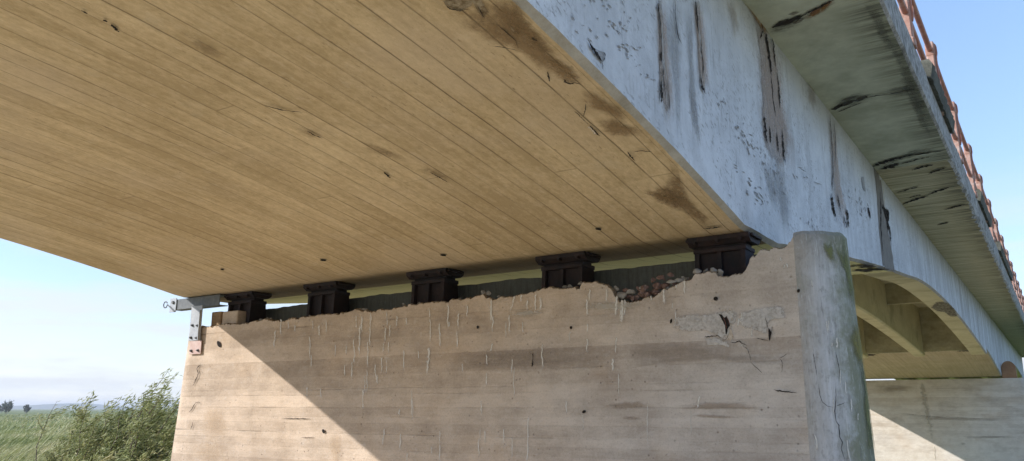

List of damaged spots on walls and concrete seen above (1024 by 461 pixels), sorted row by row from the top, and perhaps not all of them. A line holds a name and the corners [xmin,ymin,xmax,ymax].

leakage [471,9,574,80]
leakage [590,96,632,136]
leakage [653,177,705,221]
spalling [614,268,724,302]
spalling [673,306,785,347]
crack [732,318,845,459]